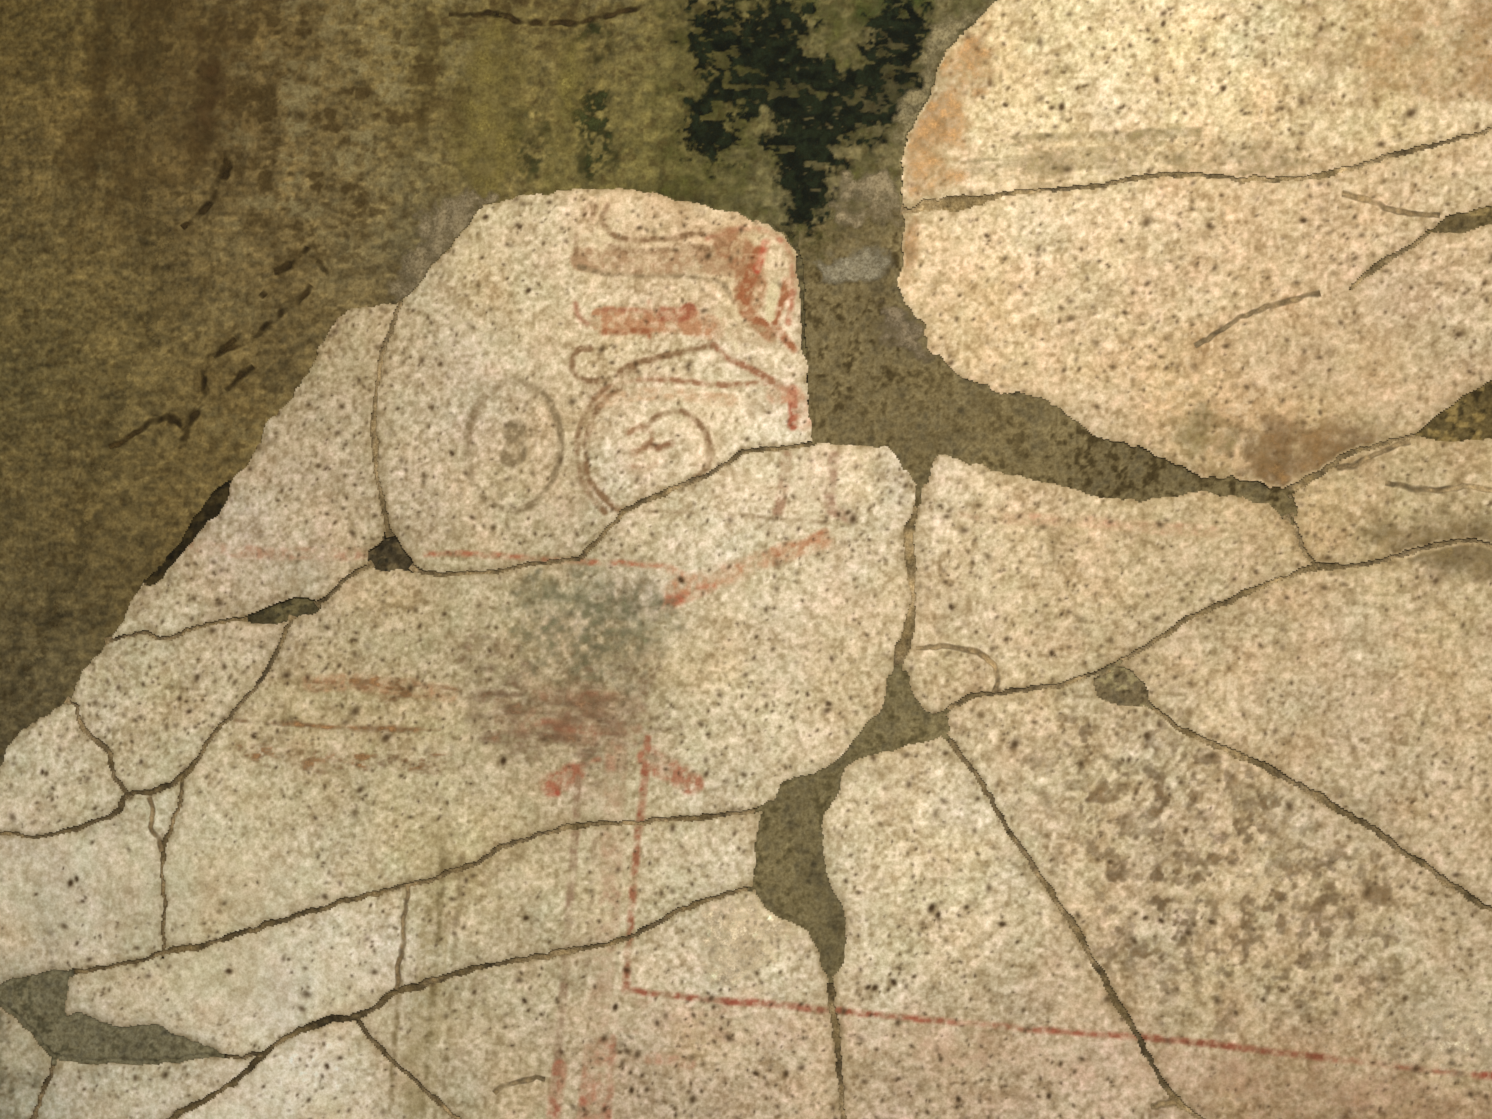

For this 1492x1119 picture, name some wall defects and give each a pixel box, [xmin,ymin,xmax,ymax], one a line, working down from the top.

damp [560,23,617,178]
damp [661,0,963,239]
crack [900,127,1492,348]
spalling [0,0,1297,766]
spalling [1415,380,1492,442]
crack [0,301,814,1119]
damp [481,682,522,714]
damp [512,570,662,673]
spalling [748,664,950,983]
crack [894,433,1492,1119]
spalling [0,969,224,1065]
crack [826,983,847,1119]